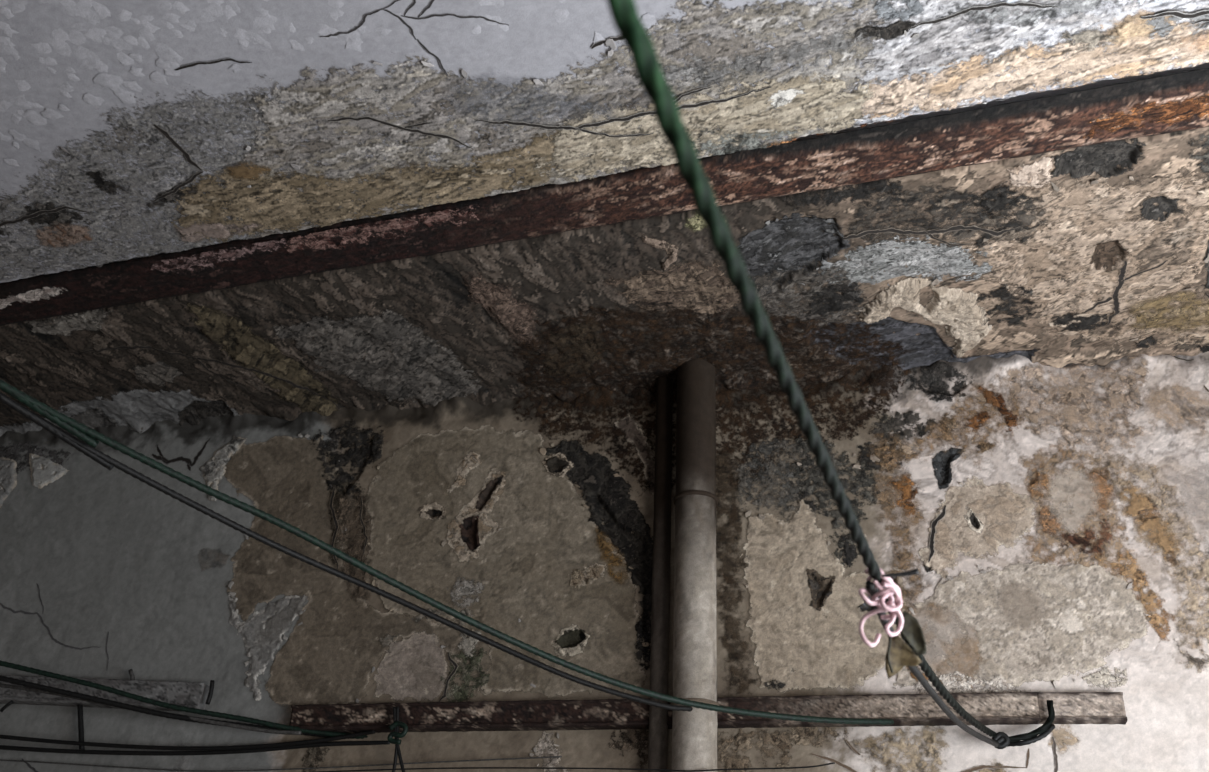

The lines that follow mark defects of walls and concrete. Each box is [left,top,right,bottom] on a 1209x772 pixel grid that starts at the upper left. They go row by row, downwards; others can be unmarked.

crack [174,58,252,71]
crack [319,0,508,77]
flaking render [647,0,1209,159]
crack [911,2,1060,29]
rust [1083,94,1209,138]
crack [1141,10,1209,24]
flaking render [0,39,679,309]
flaking render [737,138,1209,370]
mould [977,284,1038,326]
leakage [463,259,972,693]
flaking render [740,443,1153,693]
leakage [608,729,649,771]